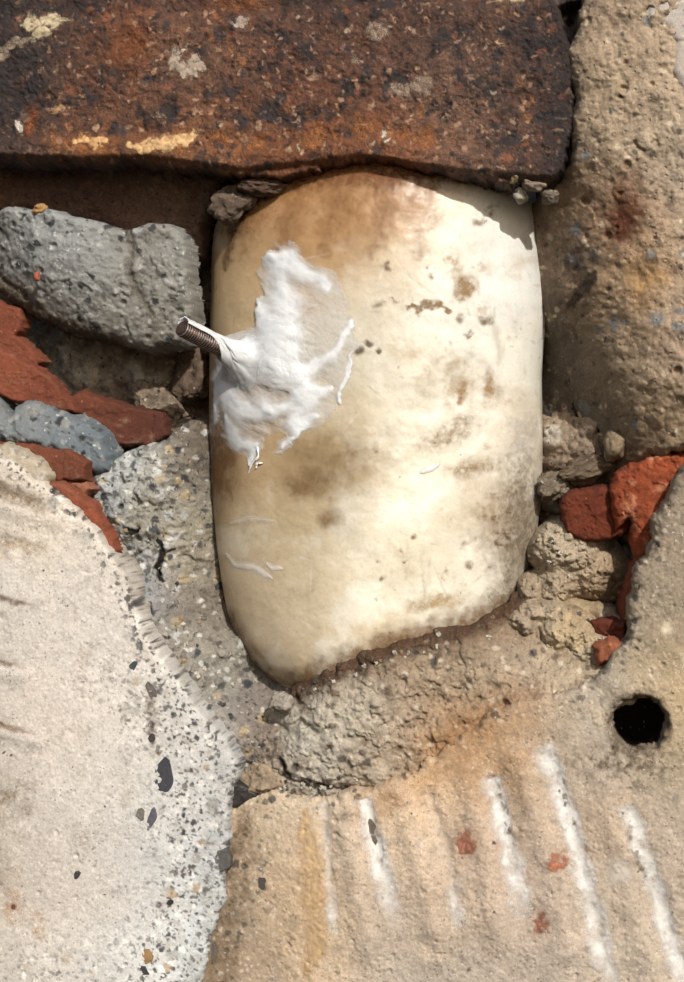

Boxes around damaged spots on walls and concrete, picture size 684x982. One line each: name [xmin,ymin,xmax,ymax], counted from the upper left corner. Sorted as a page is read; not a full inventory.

corrosion [291,164,446,186]
water stain [210,435,235,493]
crack [123,528,176,582]